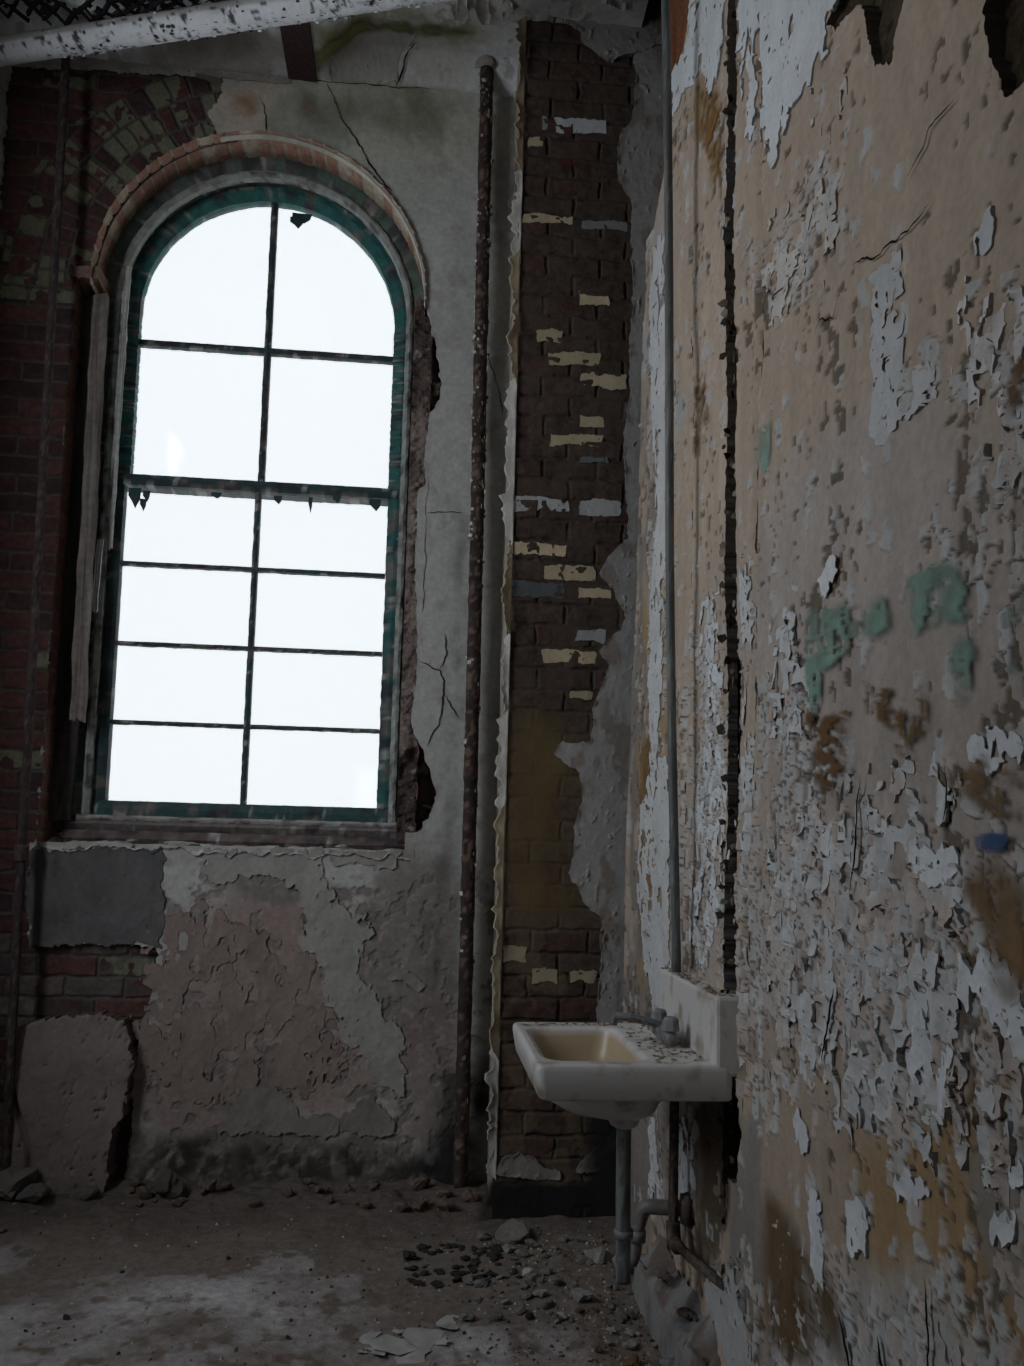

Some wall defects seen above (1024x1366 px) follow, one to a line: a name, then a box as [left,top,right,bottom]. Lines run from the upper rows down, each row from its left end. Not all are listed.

spalling [1002,0,1024,90]
crack [317,41,430,190]
peeling [973,205,997,256]
peeling [868,246,1024,505]
spalling [0,0,904,1182]
crack [420,636,458,745]
peeling [688,550,1024,1248]
peeling [647,1103,700,1233]
peeling [807,1188,825,1292]
peeling [845,1191,871,1259]
peeling [704,1252,753,1366]
peeling [898,1322,965,1366]